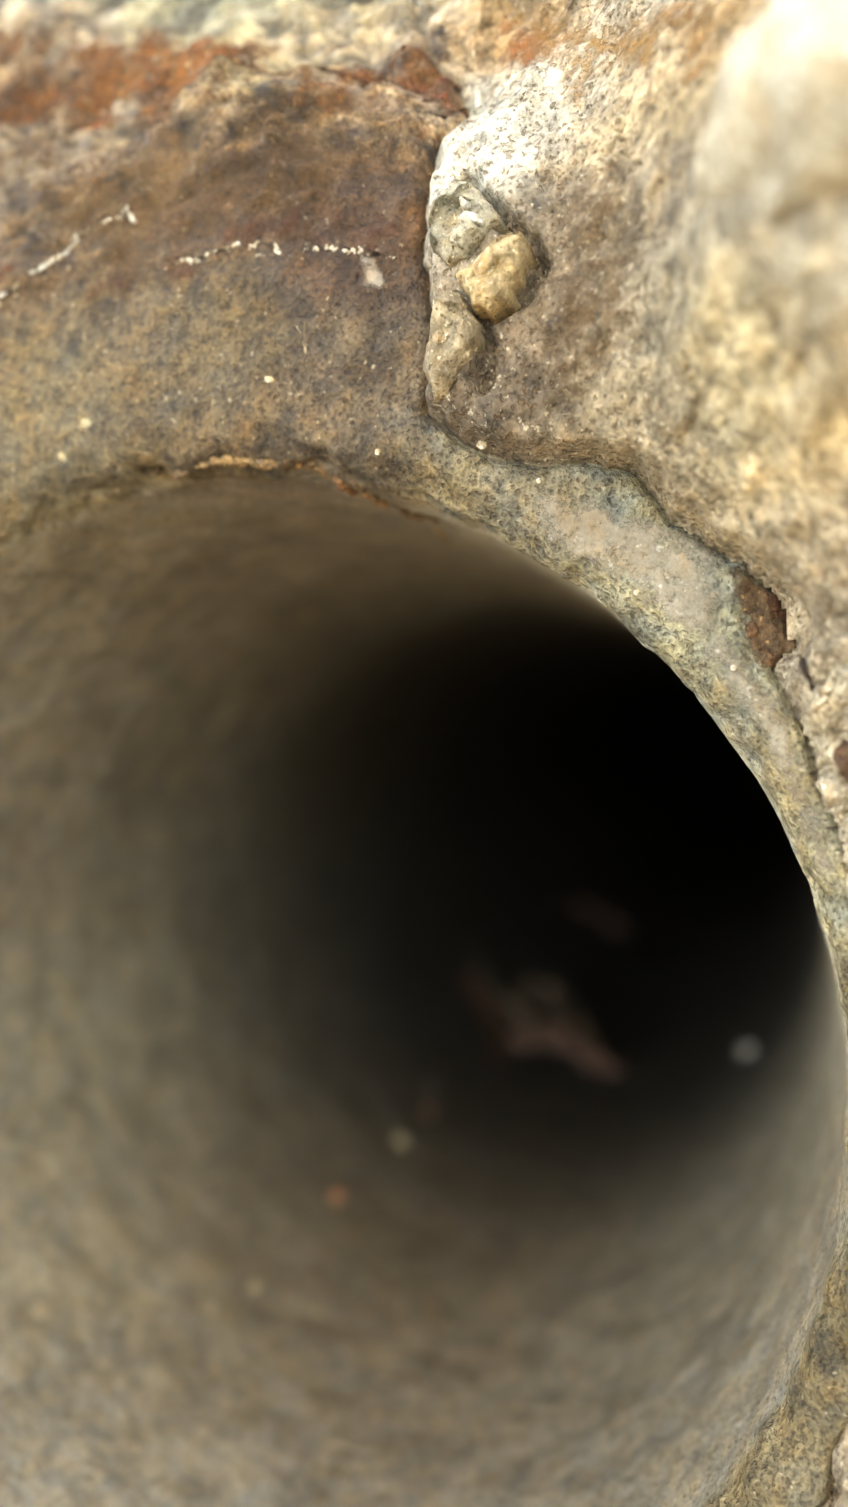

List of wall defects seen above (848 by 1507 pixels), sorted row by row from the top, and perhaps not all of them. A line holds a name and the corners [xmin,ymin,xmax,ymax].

rust [0,25,463,138]